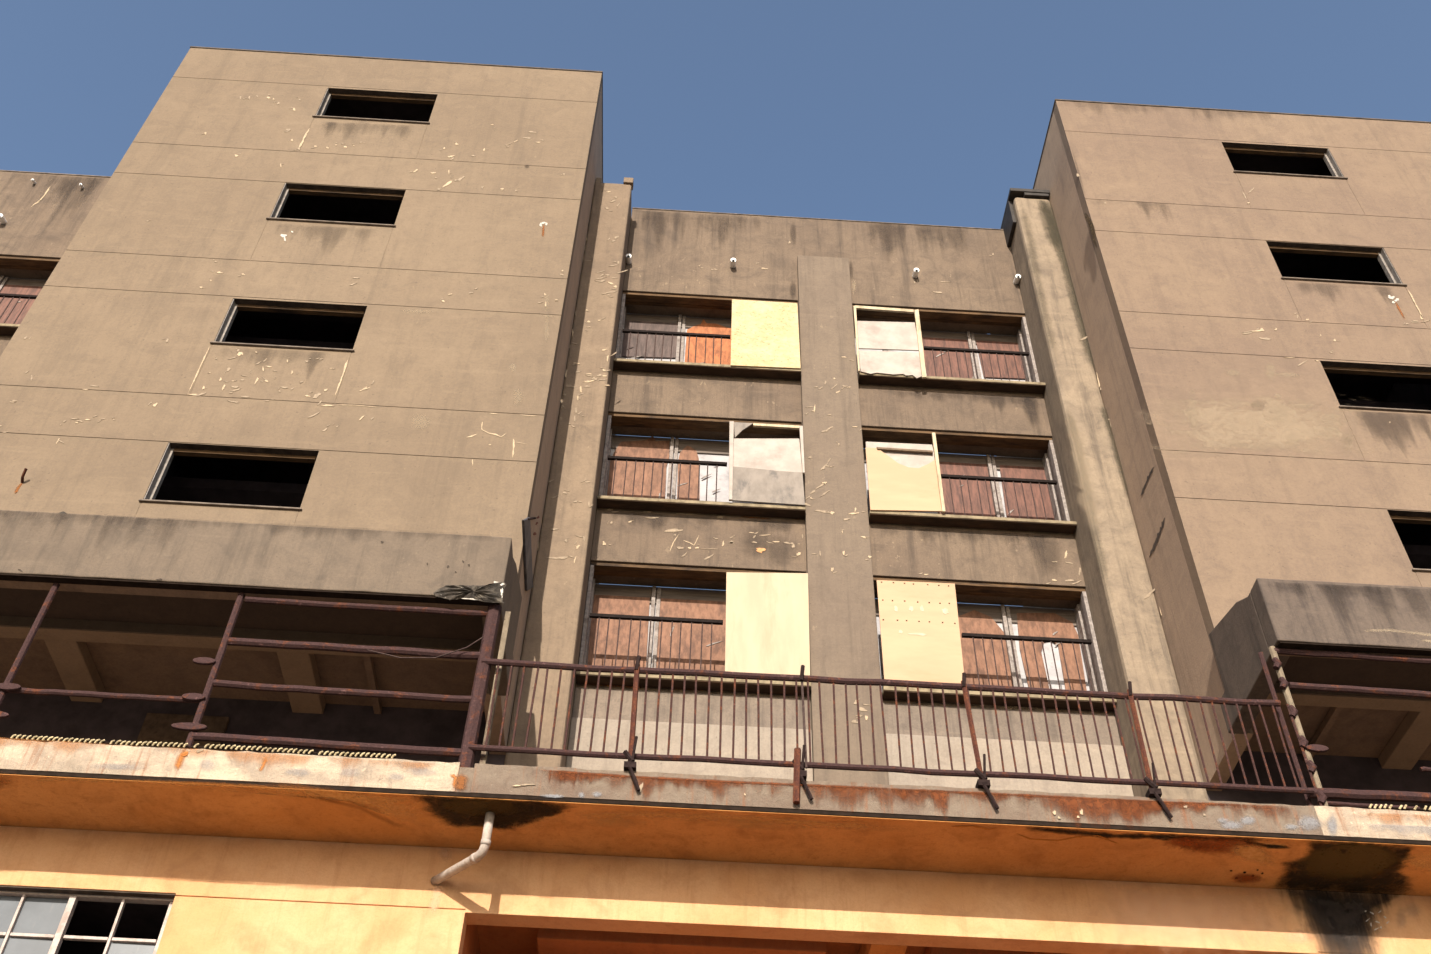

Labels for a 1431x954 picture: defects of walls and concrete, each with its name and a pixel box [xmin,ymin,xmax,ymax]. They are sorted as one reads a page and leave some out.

peeling [187,348,348,432]
peeling [805,378,866,533]
peeling [670,532,848,573]
corrosion [175,749,204,768]
water stain [420,795,564,829]
corrosion [550,770,1273,821]
water stain [1031,809,1425,954]